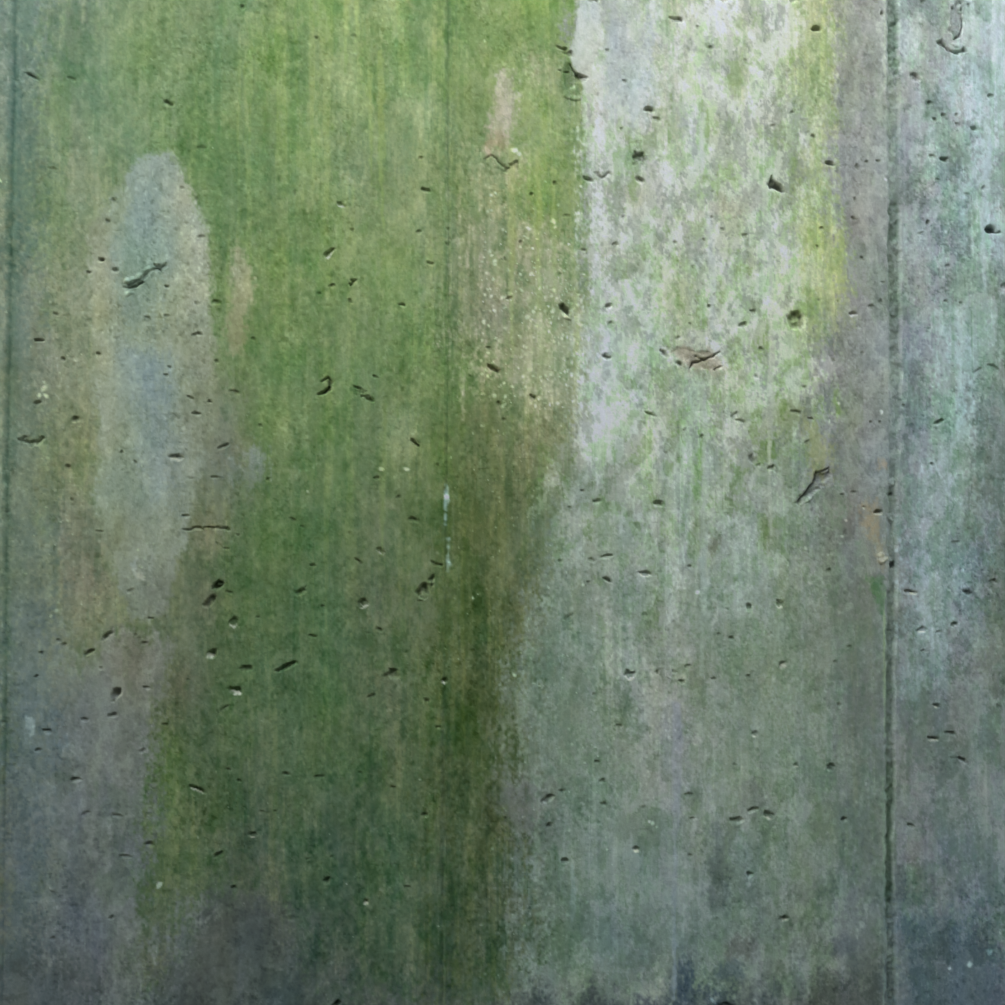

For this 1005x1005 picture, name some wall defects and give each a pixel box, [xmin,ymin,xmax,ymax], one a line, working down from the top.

damp [0,0,440,1005]
damp [419,0,888,1005]